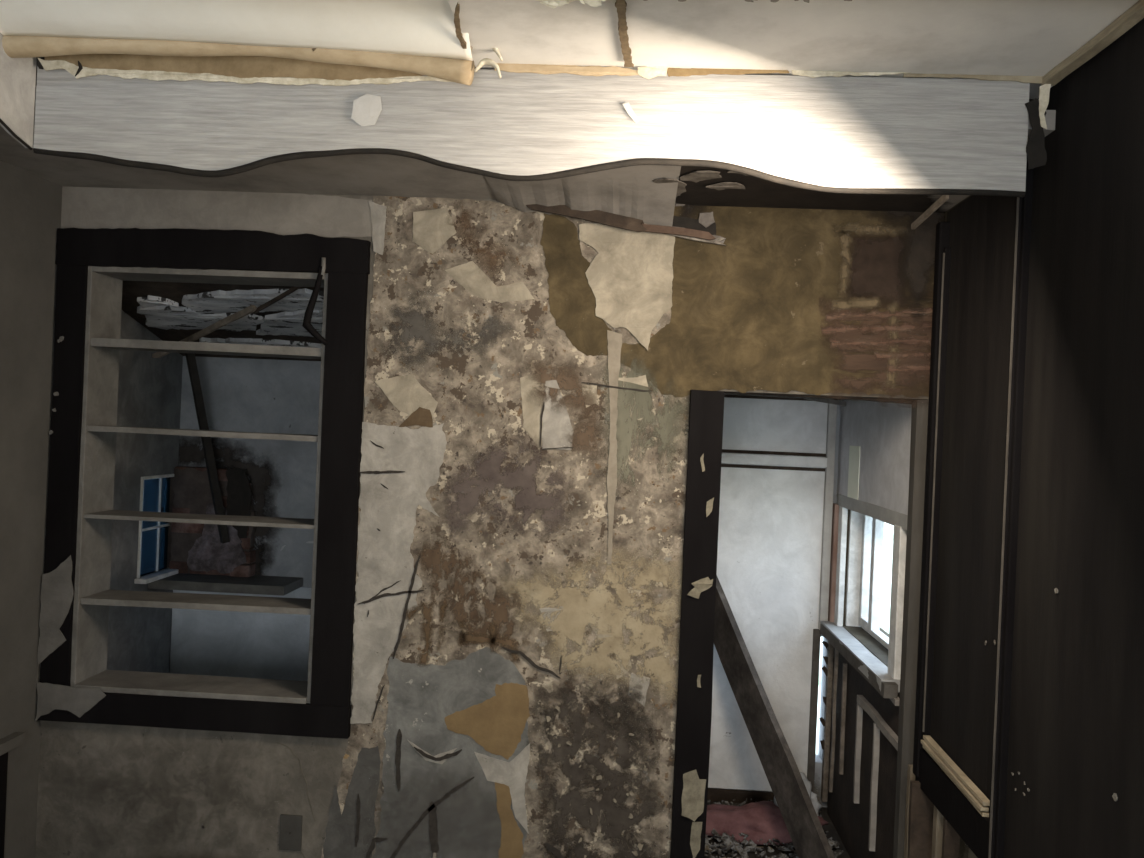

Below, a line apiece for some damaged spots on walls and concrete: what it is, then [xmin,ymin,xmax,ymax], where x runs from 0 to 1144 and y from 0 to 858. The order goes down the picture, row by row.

peeling [536,0,606,9]
flaking render [540,206,934,398]
water stain [445,433,569,536]
crack [358,555,424,659]
flaking render [323,407,530,858]
peeling [687,577,713,599]
water stain [507,551,683,858]
crack [355,685,474,858]
peeling [681,769,706,858]